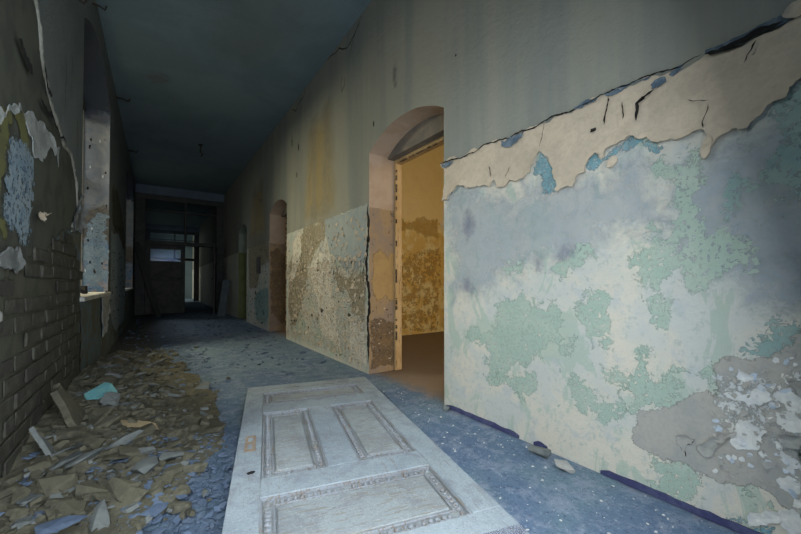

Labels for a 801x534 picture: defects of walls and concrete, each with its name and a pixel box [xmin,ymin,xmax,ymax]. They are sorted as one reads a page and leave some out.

flaking render [0,0,126,478]
peeling [247,203,394,369]
peeling [402,216,438,238]
peeling [559,314,801,534]